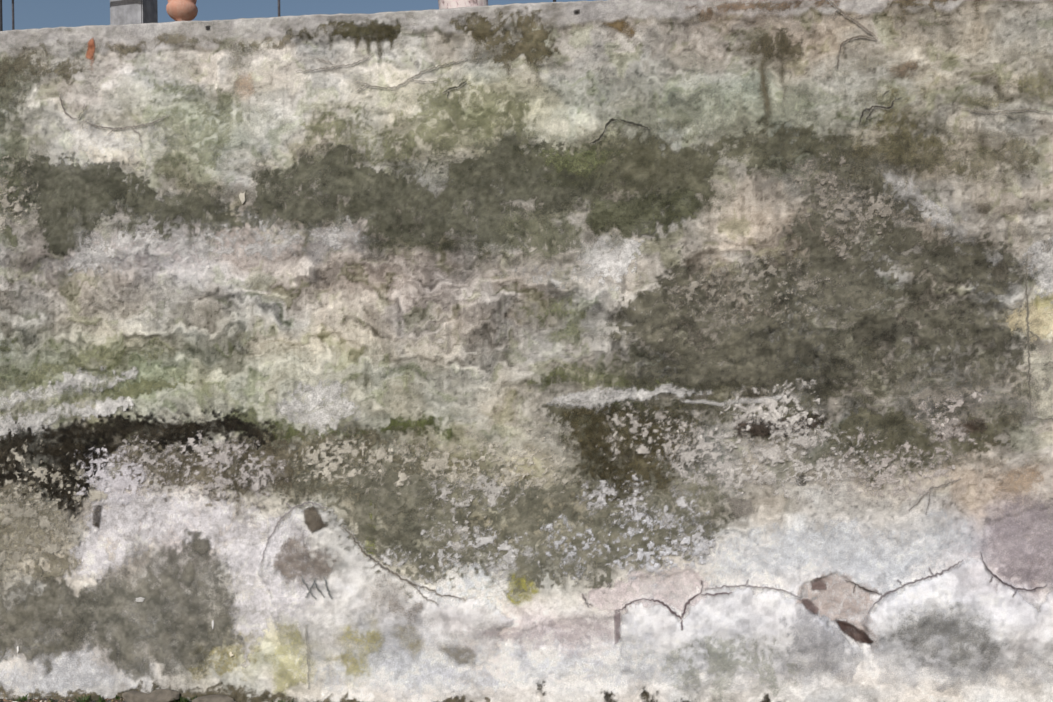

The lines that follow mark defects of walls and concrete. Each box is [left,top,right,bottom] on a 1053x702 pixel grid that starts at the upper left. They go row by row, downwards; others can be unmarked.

corrosion [86,38,95,59]
leakage [106,33,198,59]
leakage [234,19,401,72]
crack [590,118,650,144]
crack [858,90,902,124]
peeling [0,380,987,648]
crack [261,501,465,605]
crack [617,579,801,630]
crack [846,552,1047,613]